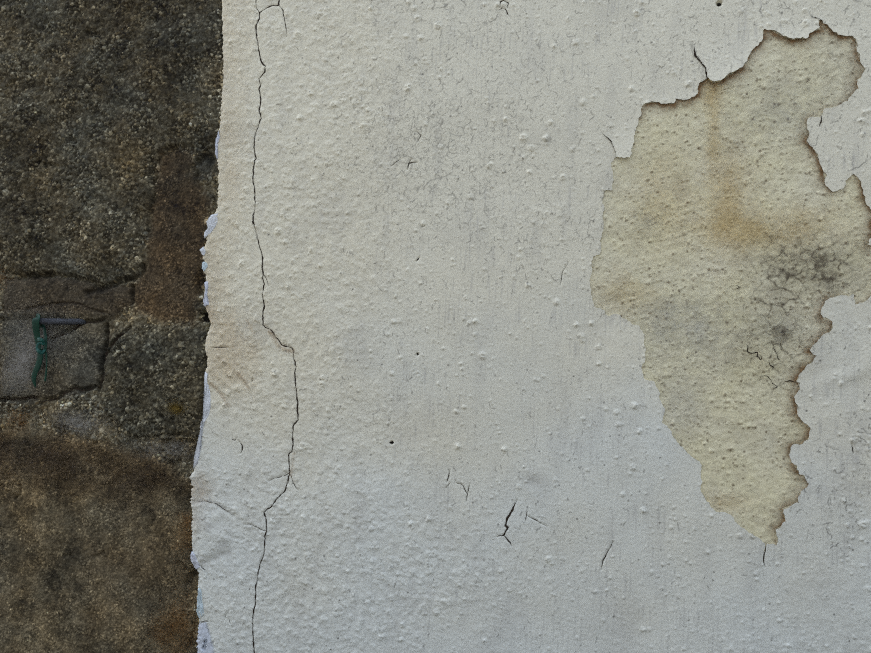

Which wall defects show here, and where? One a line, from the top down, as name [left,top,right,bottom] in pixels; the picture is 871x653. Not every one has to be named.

crack [250,0,299,653]
crack [497,503,544,544]
peeling [590,16,871,551]